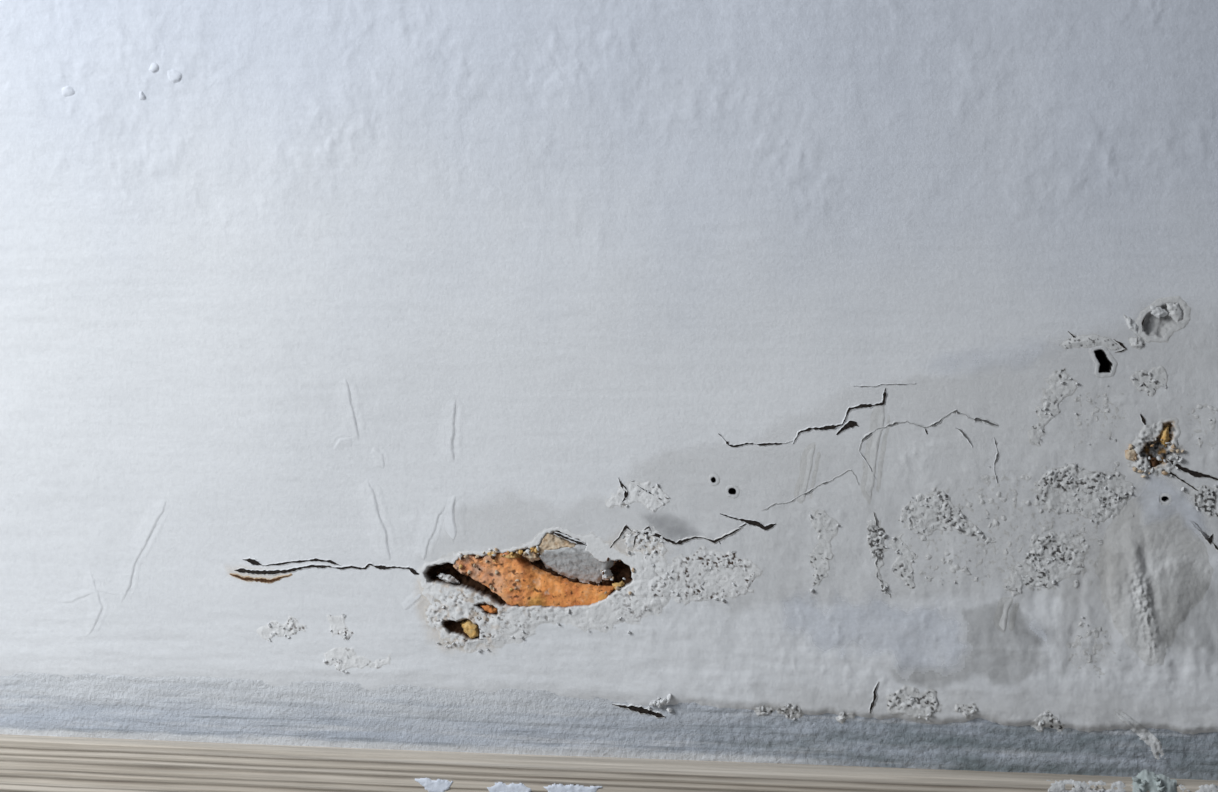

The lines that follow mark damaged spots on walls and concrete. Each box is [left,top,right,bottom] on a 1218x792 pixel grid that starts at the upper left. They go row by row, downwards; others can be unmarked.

crack [230,557,419,584]
spalling [416,480,763,653]
crack [610,383,1000,549]
peeling [866,296,1218,598]
damp [1144,477,1202,531]